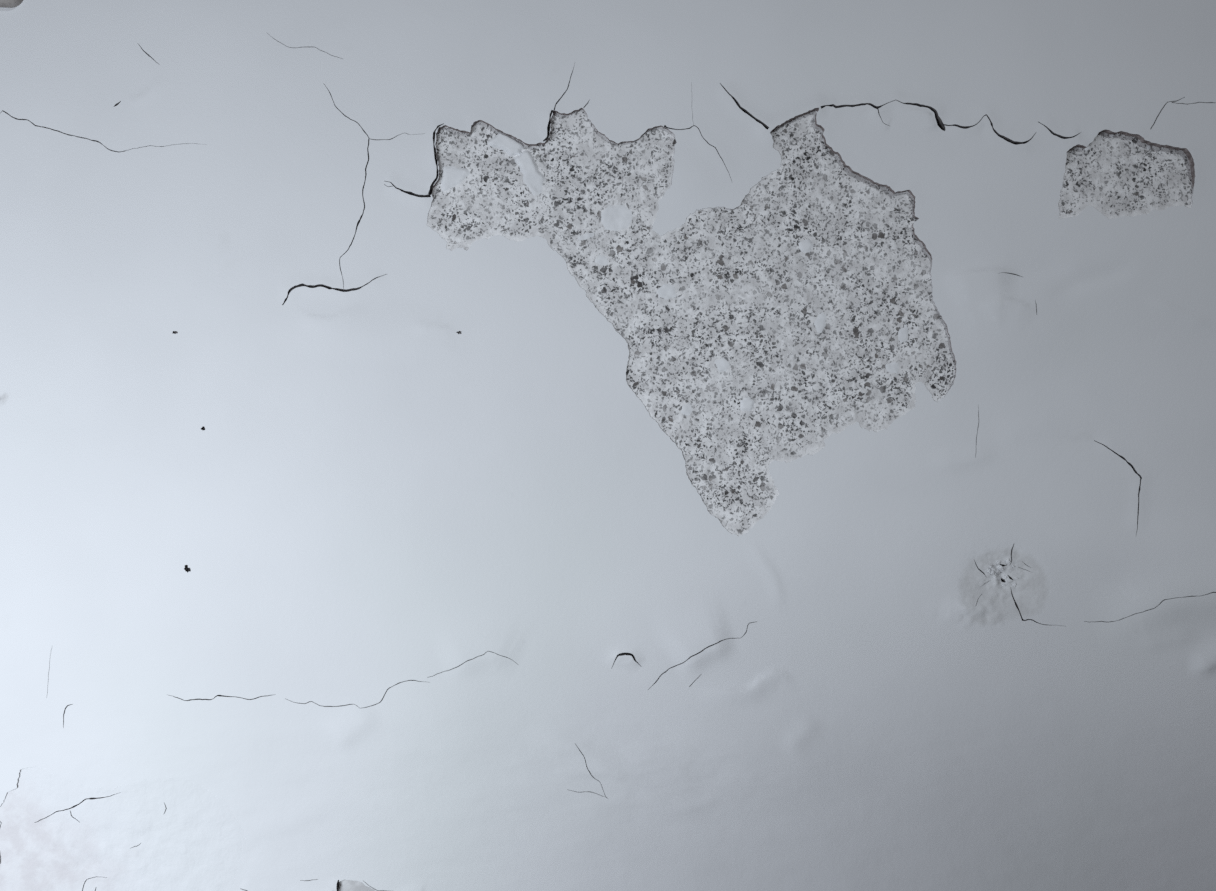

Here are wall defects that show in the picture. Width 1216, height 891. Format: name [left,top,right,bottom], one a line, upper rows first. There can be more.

crack [3,111,207,152]
crack [282,84,444,305]
crack [664,82,769,181]
crack [821,100,1080,145]
spalling [1058,129,1195,219]
spalling [427,108,956,536]
crack [1094,440,1142,533]
crack [974,545,1216,626]
crack [169,651,517,708]
crack [611,622,754,690]
peeling [0,766,246,891]
peeling [338,880,375,891]